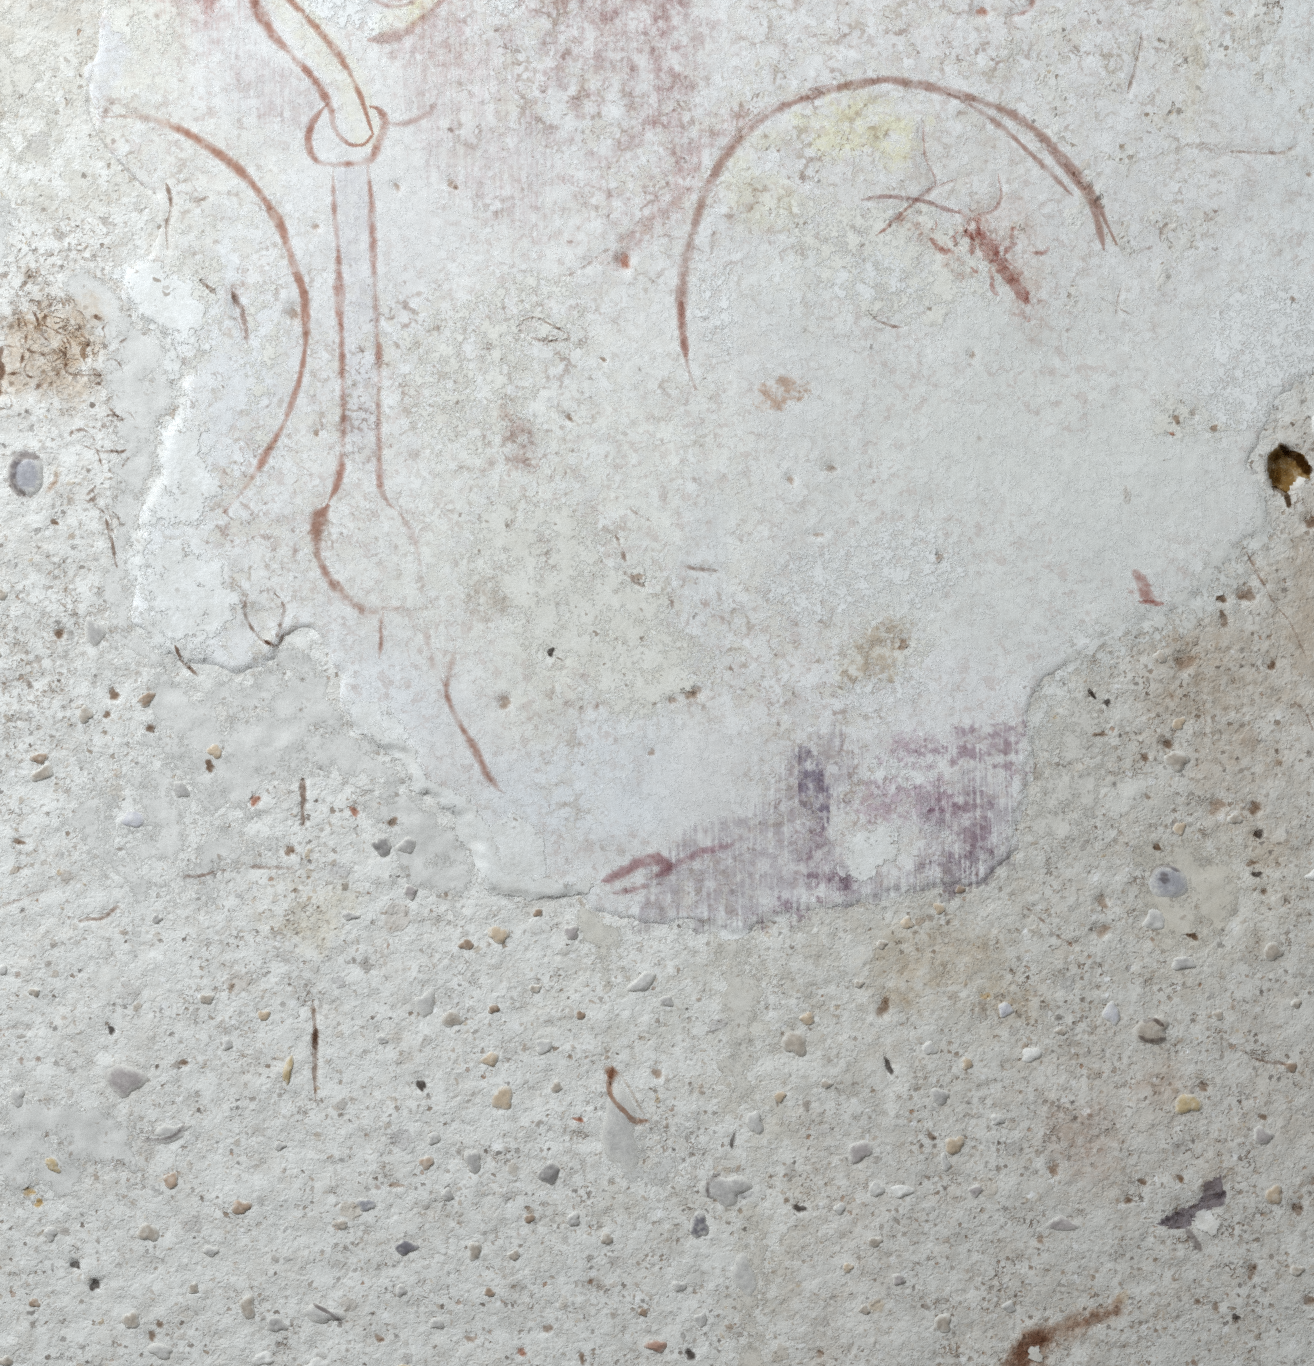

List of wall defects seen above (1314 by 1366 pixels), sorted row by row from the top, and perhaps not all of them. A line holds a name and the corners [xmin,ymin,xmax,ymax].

flaking render [103,0,186,53]
flaking render [776,196,1013,329]
flaking render [107,215,242,668]
flaking render [239,258,285,481]
flaking render [1146,391,1246,447]
spalling [1268,444,1312,507]
flaking render [454,493,717,727]
flaking render [670,599,1170,940]
spalling [1192,1209,1223,1236]
peeling [1028,1346,1043,1362]